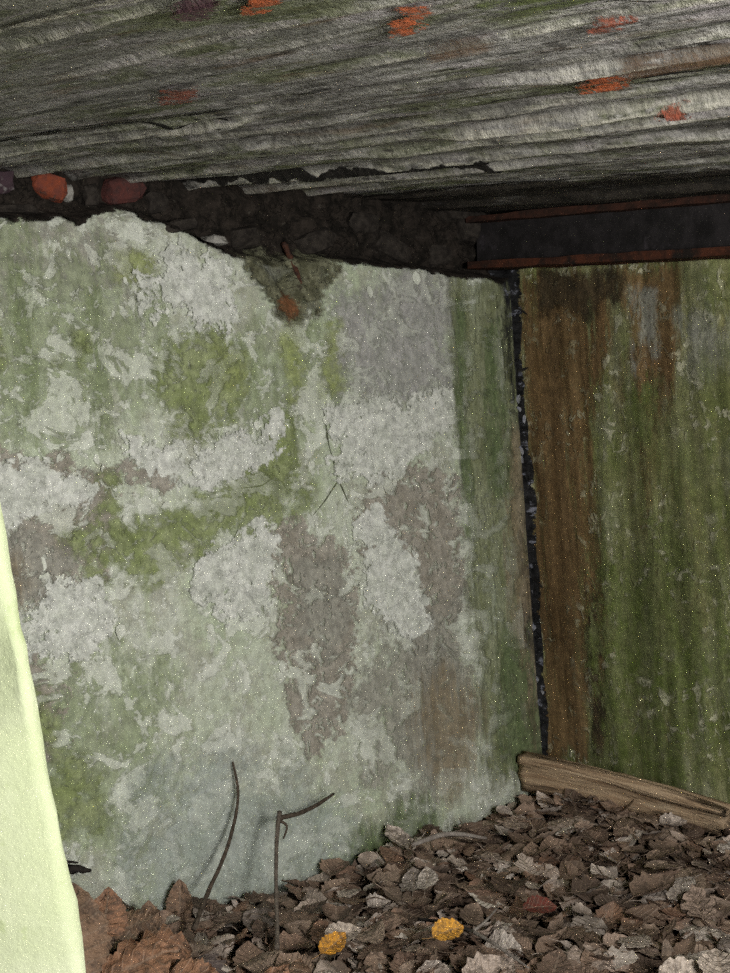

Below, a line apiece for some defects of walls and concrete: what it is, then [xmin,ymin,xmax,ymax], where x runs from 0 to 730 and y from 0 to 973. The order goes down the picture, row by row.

water stain [10,263,38,415]
water stain [95,471,134,550]
water stain [264,412,297,507]
water stain [455,303,474,503]
water stain [484,320,532,628]
rust [519,269,611,763]
rust [617,263,680,537]
water stain [498,629,542,769]
water stain [146,759,342,910]